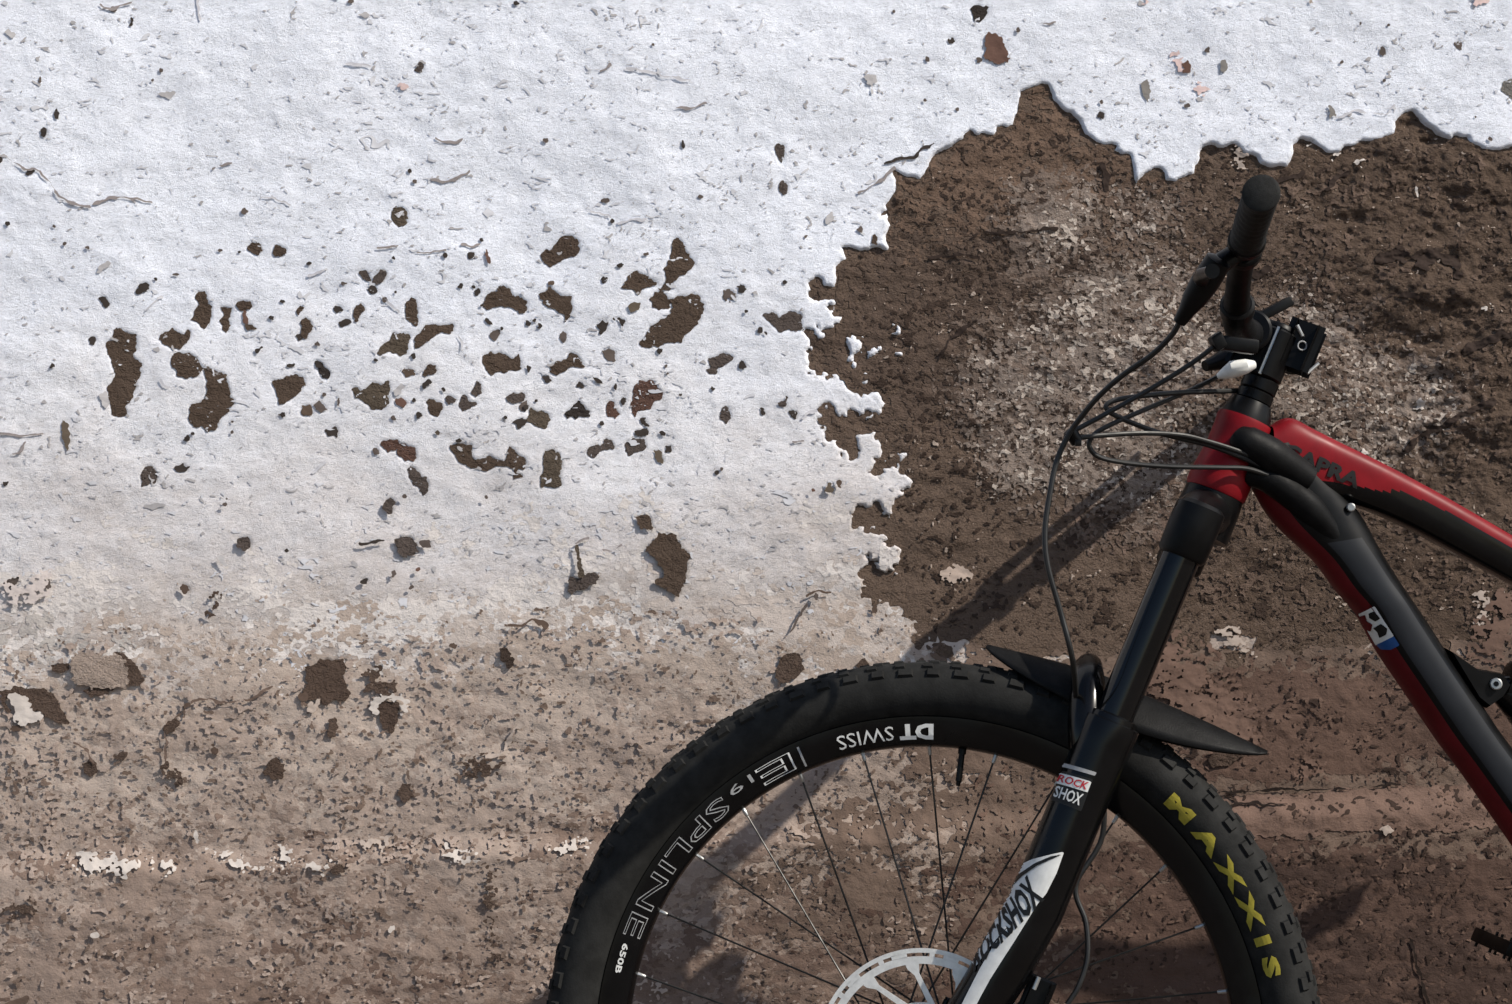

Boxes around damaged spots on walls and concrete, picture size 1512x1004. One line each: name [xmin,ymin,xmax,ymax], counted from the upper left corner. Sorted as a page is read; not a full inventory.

spalling [723,284,804,335]
spalling [88,328,142,417]
spalling [159,236,704,488]
spalling [706,353,746,391]
spalling [141,463,190,487]
spalling [373,439,429,514]
spalling [391,536,431,591]
spalling [636,514,691,597]
spalling [0,686,70,732]
spalling [298,658,351,738]
spalling [369,693,410,734]
peeling [1148,626,1266,745]